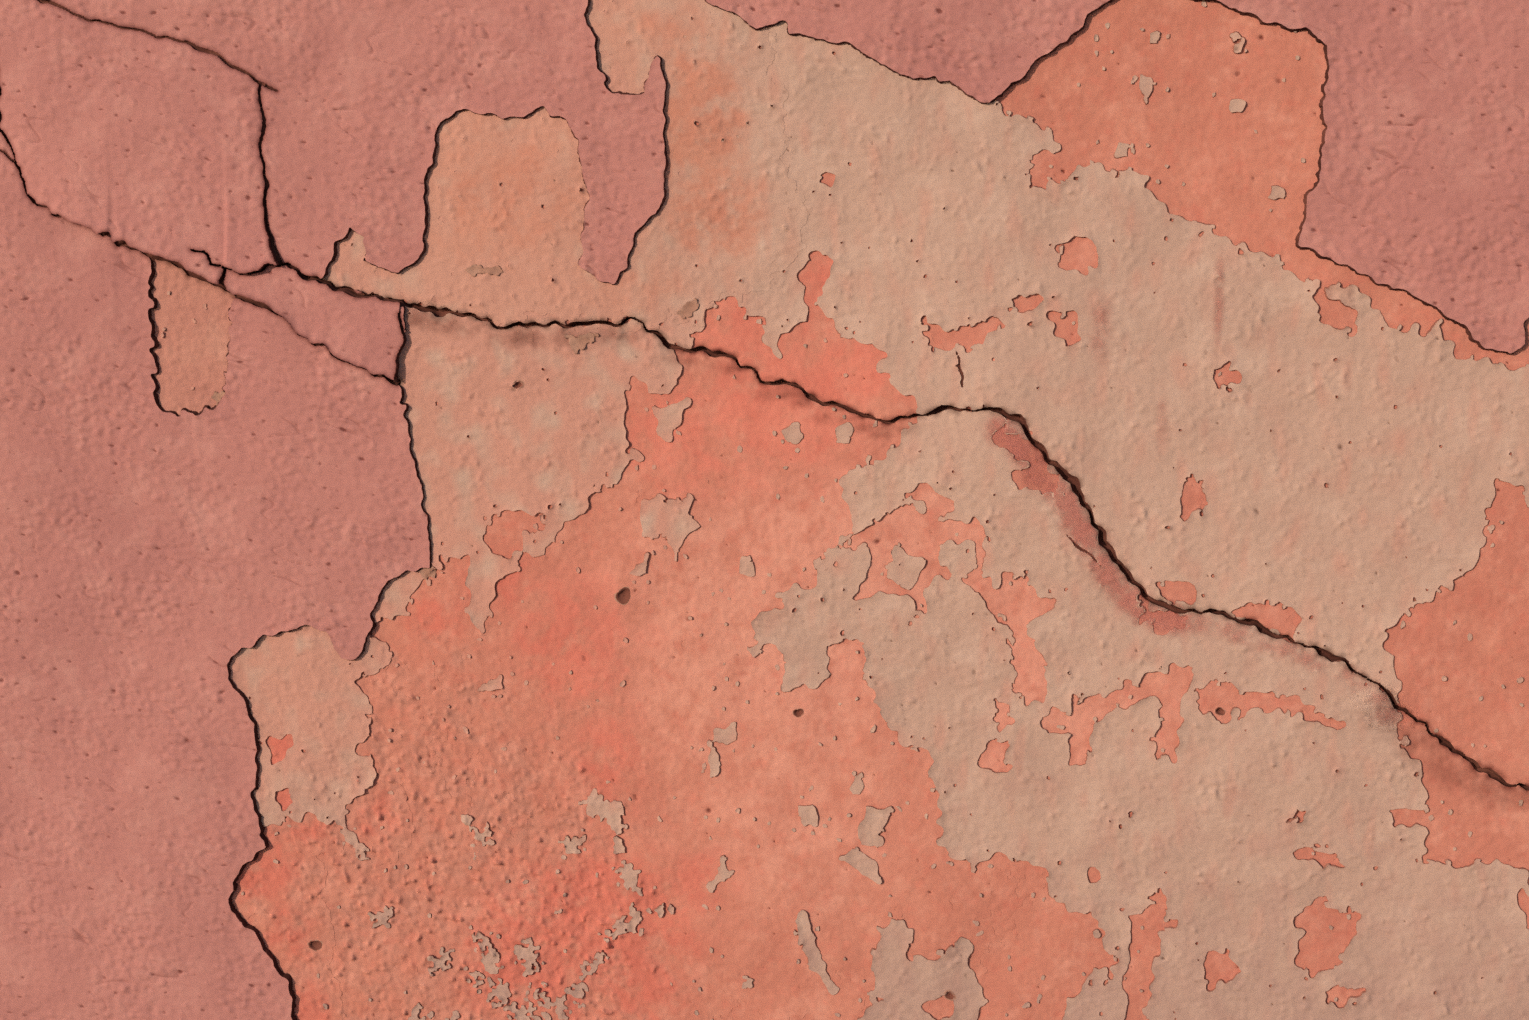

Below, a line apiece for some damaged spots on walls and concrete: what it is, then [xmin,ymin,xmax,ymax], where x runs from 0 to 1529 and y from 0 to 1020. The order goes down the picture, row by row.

crack [0,87,62,217]
flaking render [151,259,236,415]
peeling [644,397,692,442]
crack [38,0,1529,790]
peeling [614,489,711,605]
peeling [880,542,926,590]
peeling [690,707,754,777]
peeling [836,801,909,884]
spalling [307,940,323,951]
peeling [427,946,455,976]
peeling [463,788,675,1020]
peeling [793,909,865,995]